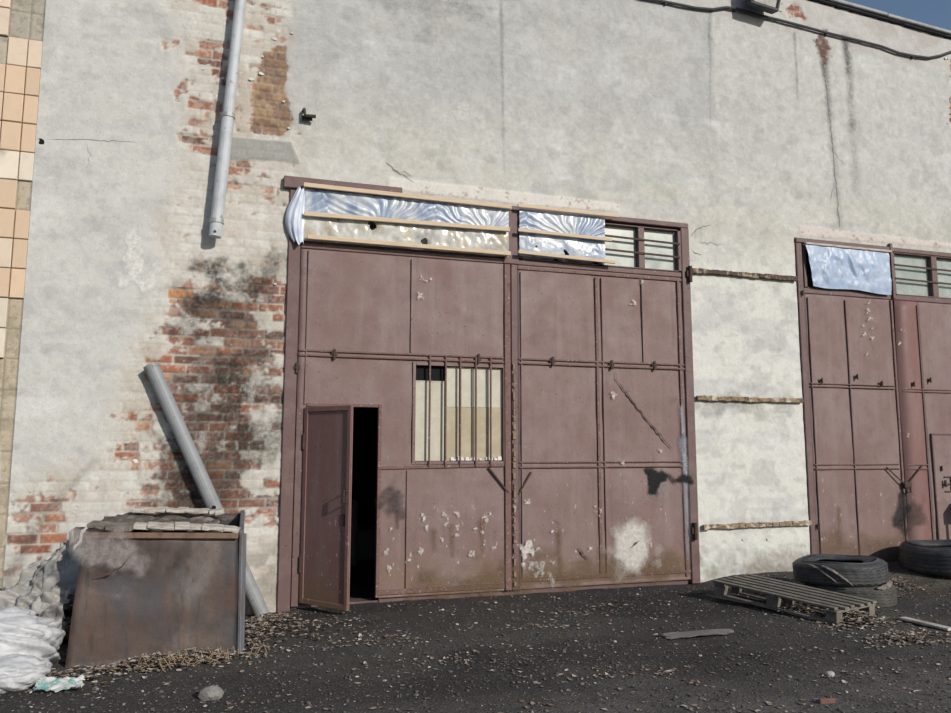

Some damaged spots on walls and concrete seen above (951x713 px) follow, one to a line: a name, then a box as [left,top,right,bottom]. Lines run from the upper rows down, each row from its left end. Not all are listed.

peeling [18,0,46,19]
spalling [176,0,296,137]
spalling [111,228,287,544]
peeling [520,540,538,566]